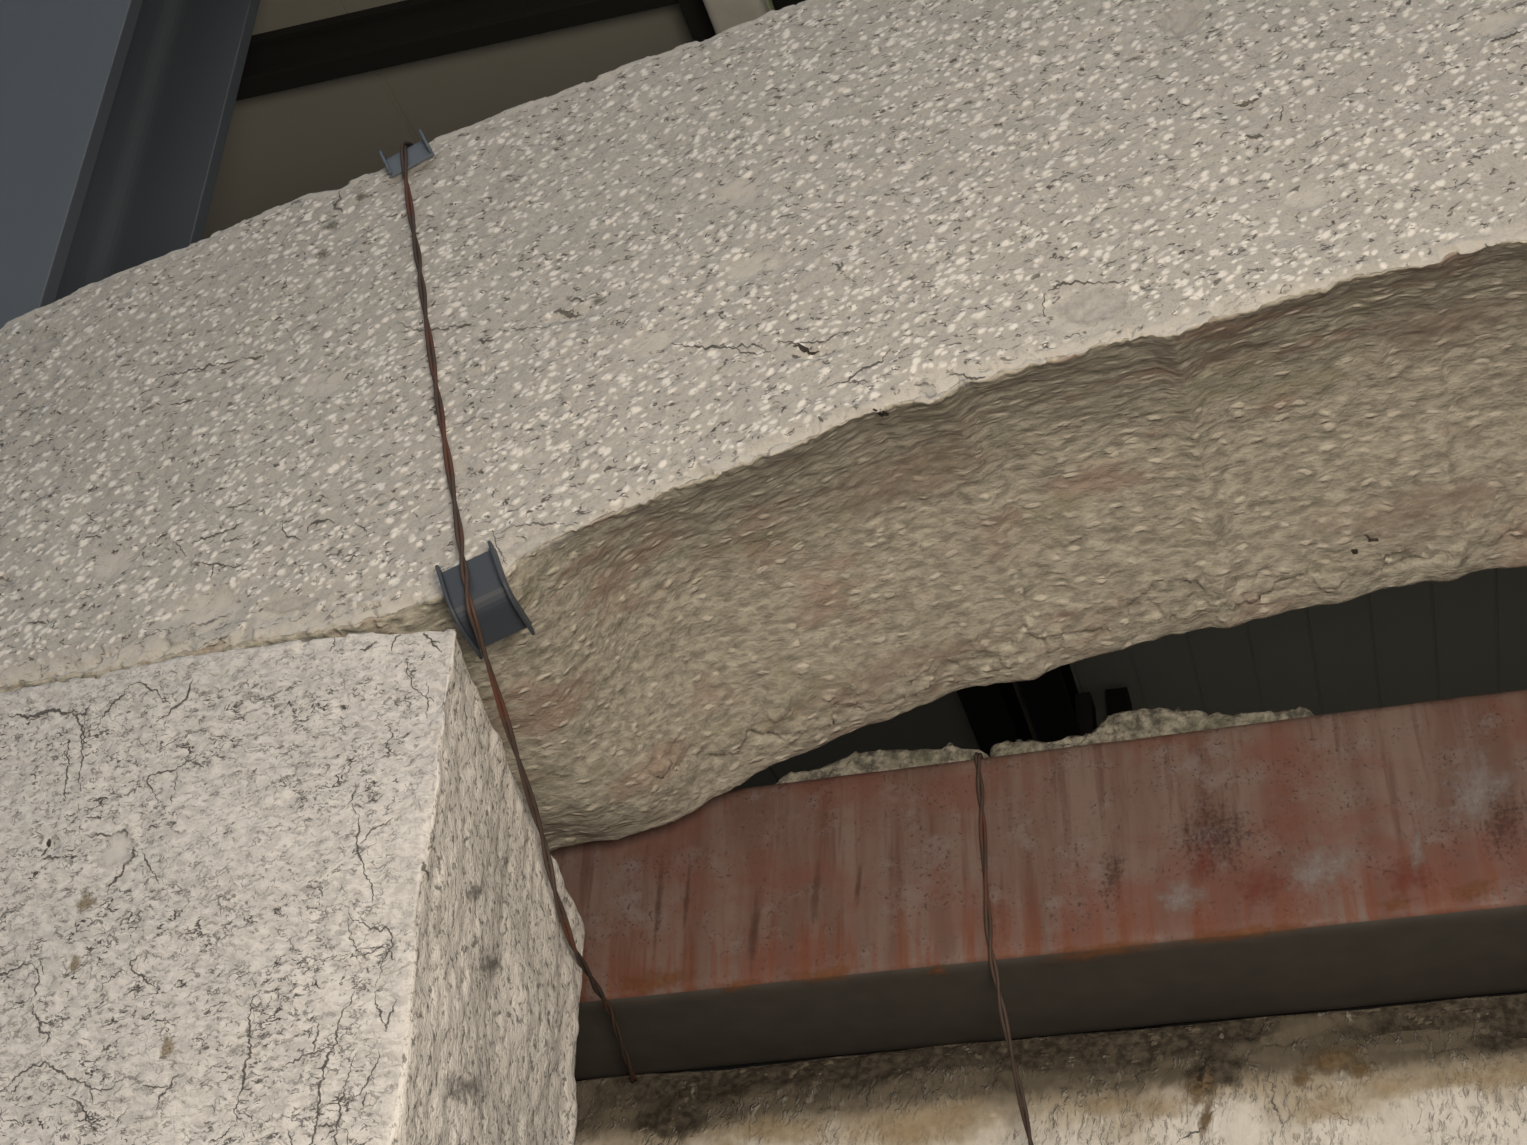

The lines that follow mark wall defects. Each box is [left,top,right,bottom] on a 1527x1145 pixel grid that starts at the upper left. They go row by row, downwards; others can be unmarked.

crack [330,632,442,715]
crack [9,680,193,801]
crack [146,753,204,803]
crack [85,829,159,892]
crack [101,953,155,994]
crack [209,783,397,1145]
crack [0,961,178,1145]
leakage [607,1015,1279,1137]
leakage [1294,1049,1370,1086]
leakage [1355,994,1527,1050]